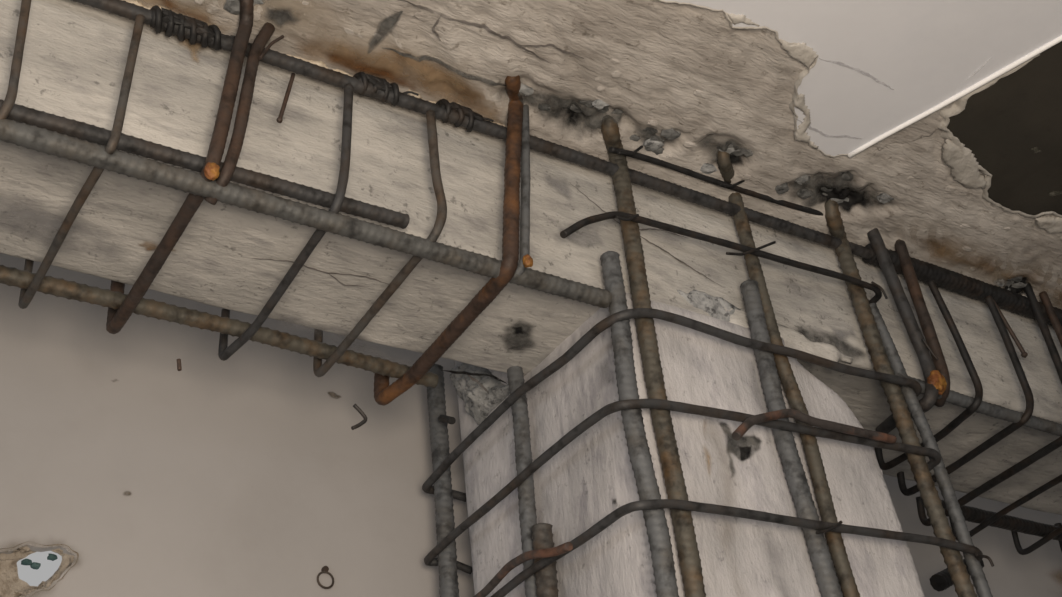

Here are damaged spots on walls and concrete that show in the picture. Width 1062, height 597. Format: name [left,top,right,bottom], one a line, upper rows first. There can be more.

spalling [72,0,240,52]
corrosion [307,45,494,116]
spalling [0,99,502,278]
spalling [0,265,128,310]
spalling [245,0,1062,597]
spalling [133,298,412,379]
spalling [0,541,79,597]